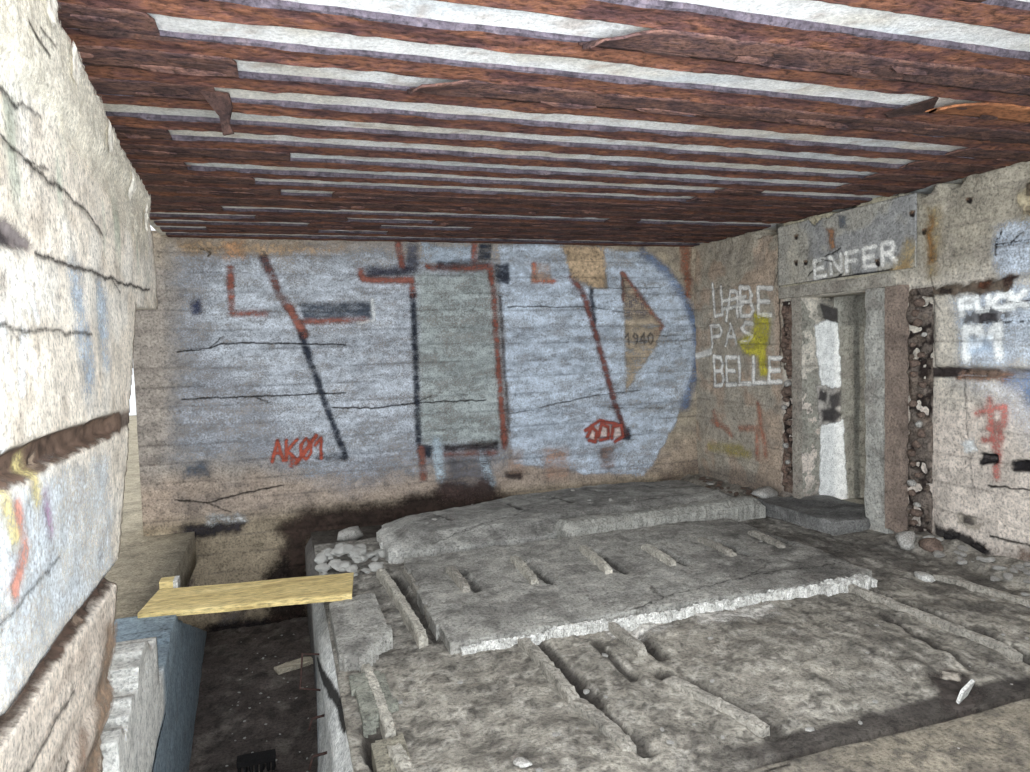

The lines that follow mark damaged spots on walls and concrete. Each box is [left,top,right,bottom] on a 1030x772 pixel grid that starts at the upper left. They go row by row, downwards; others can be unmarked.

crack [28,18,56,57]
crack [0,86,42,120]
flaking render [0,0,861,254]
peeling [407,29,1030,194]
crack [0,134,103,236]
spalling [1017,183,1030,219]
crack [34,251,150,293]
crack [0,322,92,340]
crack [177,338,346,352]
crack [178,485,284,512]